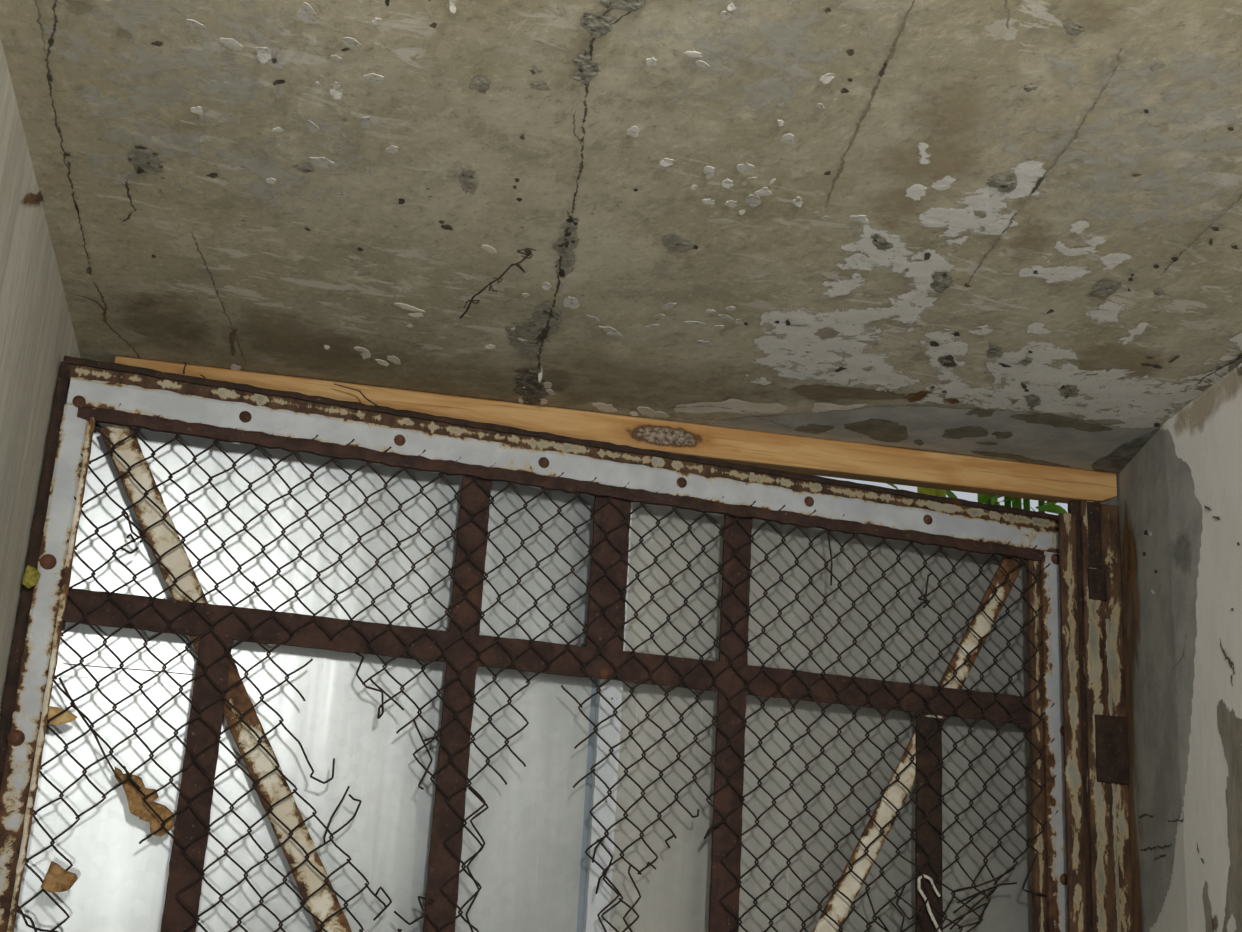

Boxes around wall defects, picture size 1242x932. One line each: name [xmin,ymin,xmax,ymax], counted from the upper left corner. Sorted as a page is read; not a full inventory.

crack [35,0,140,359]
crack [506,1,640,373]
crack [826,0,915,206]
peeling [917,142,931,164]
crack [964,48,1122,287]
peeling [591,398,790,428]
leakage [793,384,904,401]
leakage [796,419,924,446]
peeling [684,160,1242,429]
leakage [942,409,1112,467]
peeling [1203,700,1242,932]